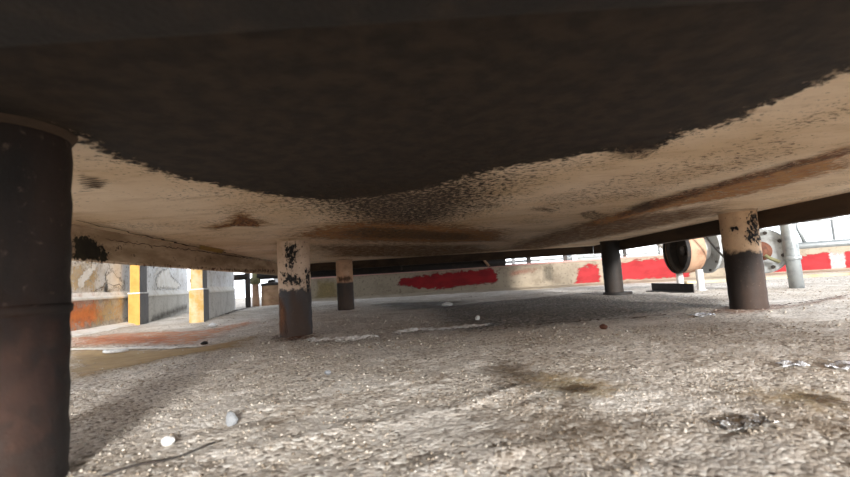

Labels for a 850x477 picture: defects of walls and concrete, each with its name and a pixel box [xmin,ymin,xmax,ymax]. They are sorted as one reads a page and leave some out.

leakage [0,0,850,228]
corrosion [593,148,850,226]
corrosion [204,212,262,229]
corrosion [296,219,507,243]
peeling [730,211,761,246]
peeling [280,243,311,294]
corrosion [266,297,319,341]